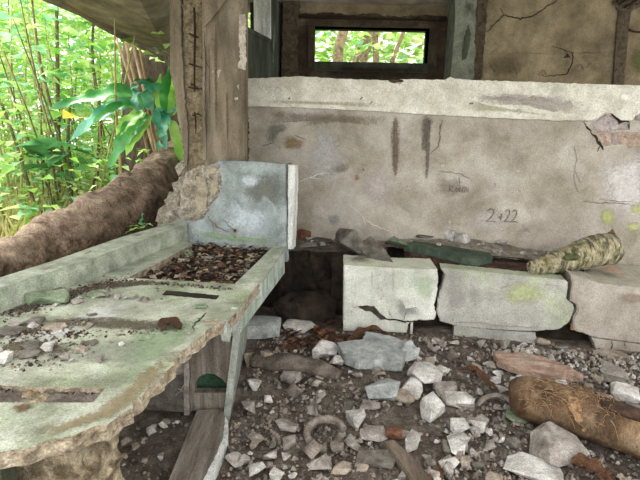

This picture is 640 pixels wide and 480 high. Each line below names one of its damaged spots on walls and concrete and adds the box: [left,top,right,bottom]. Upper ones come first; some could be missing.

crack [486,0,557,32]
crack [496,46,574,77]
spalling [180,0,222,222]
damp [391,118,399,170]
damp [422,118,432,177]
spalling [584,113,640,149]
crack [359,306,424,323]